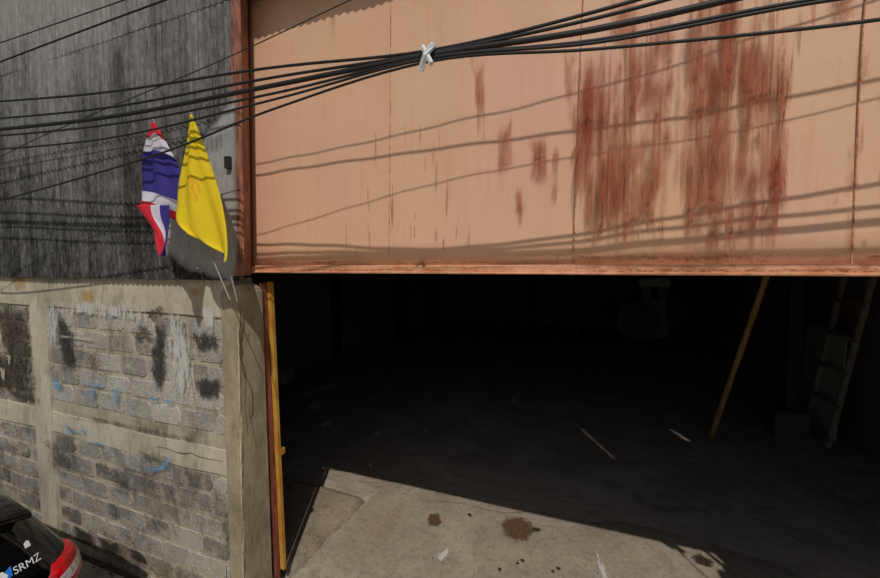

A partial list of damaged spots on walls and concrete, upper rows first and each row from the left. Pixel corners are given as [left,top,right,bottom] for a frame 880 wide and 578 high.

corrosion [476,73,484,108]
corrosion [572,4,672,243]
corrosion [682,0,792,242]
corrosion [253,232,527,272]
corrosion [556,253,880,273]
water stain [0,307,39,402]
water stain [47,302,219,400]
water stain [75,527,180,578]